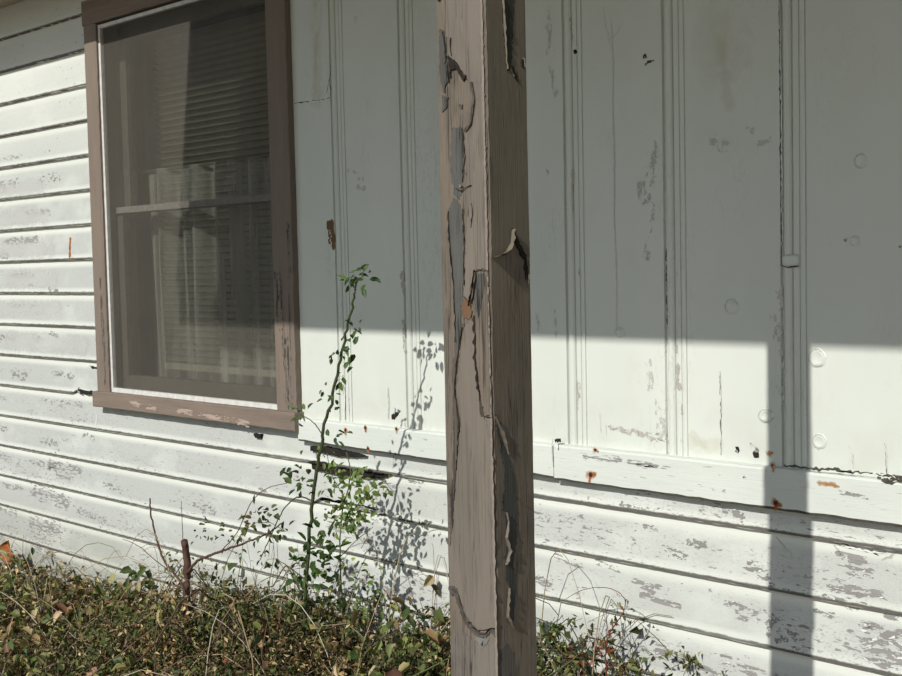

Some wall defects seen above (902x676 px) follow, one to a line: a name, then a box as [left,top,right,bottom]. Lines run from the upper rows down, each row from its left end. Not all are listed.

peeling [502,0,515,71]
peeling [493,228,530,284]
peeling [447,127,522,628]
peeling [177,409,250,428]
peeling [326,517,428,601]
peeling [448,586,496,648]
peeling [631,578,682,609]
peeling [581,632,786,676]
peeling [662,538,707,560]
peeling [724,600,810,653]
peeling [822,551,883,611]
peeling [858,613,902,672]